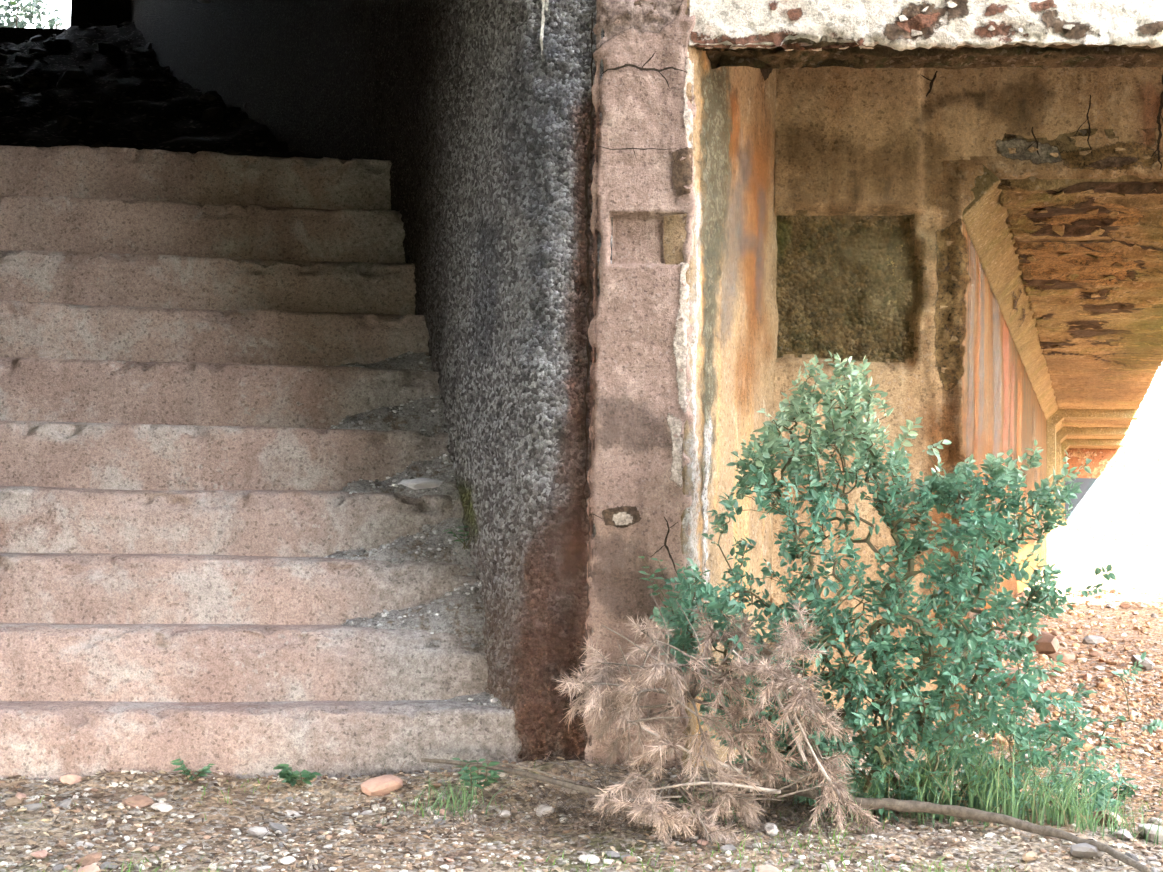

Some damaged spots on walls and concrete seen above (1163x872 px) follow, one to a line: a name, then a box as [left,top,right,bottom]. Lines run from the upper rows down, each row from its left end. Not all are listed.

leakage [540,0,549,55]
spalling [883,0,1100,42]
spalling [1136,21,1163,35]
peeling [672,29,874,200]
crack [1075,95,1092,155]
crack [1151,75,1163,170]
crack [574,13,687,521]
corrosion [730,92,769,340]
spalling [996,138,1163,349]
peeling [667,262,690,488]
leakage [682,196,712,606]